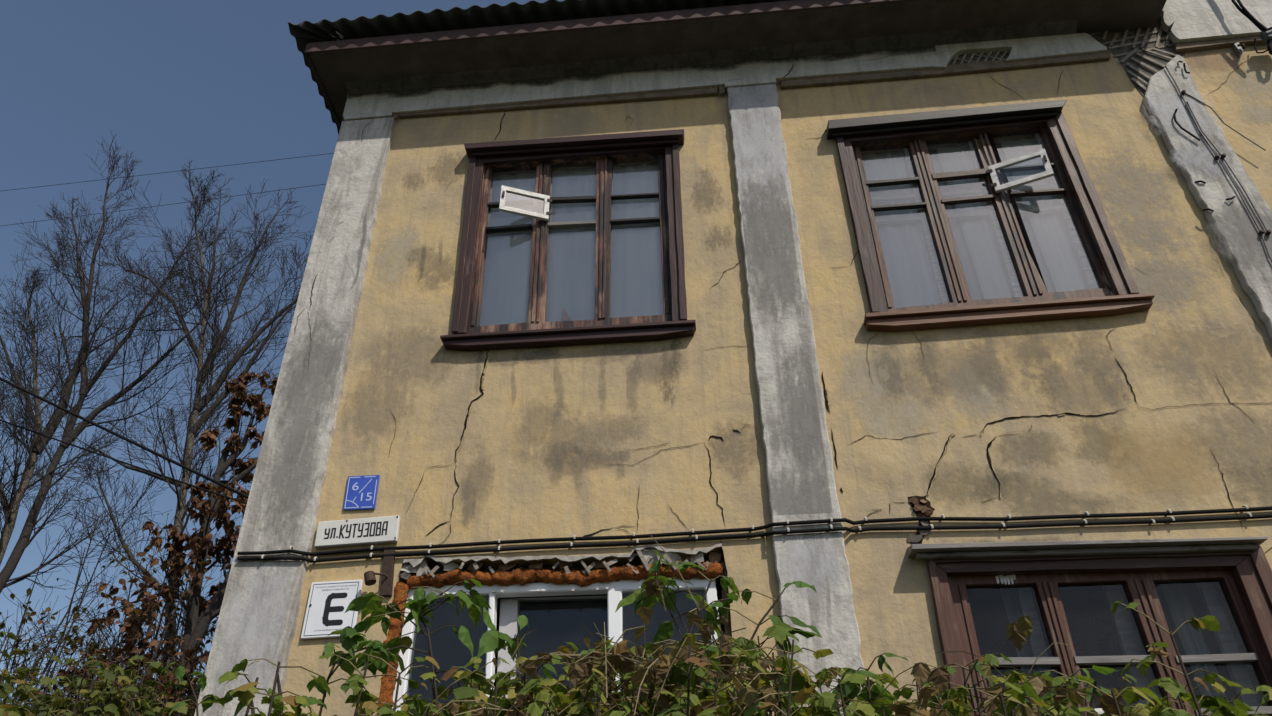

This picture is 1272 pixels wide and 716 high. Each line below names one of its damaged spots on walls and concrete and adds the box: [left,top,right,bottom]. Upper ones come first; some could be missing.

crack [406,350,489,544]
crack [569,424,756,543]
crack [822,328,1272,503]
crack [1210,448,1244,530]